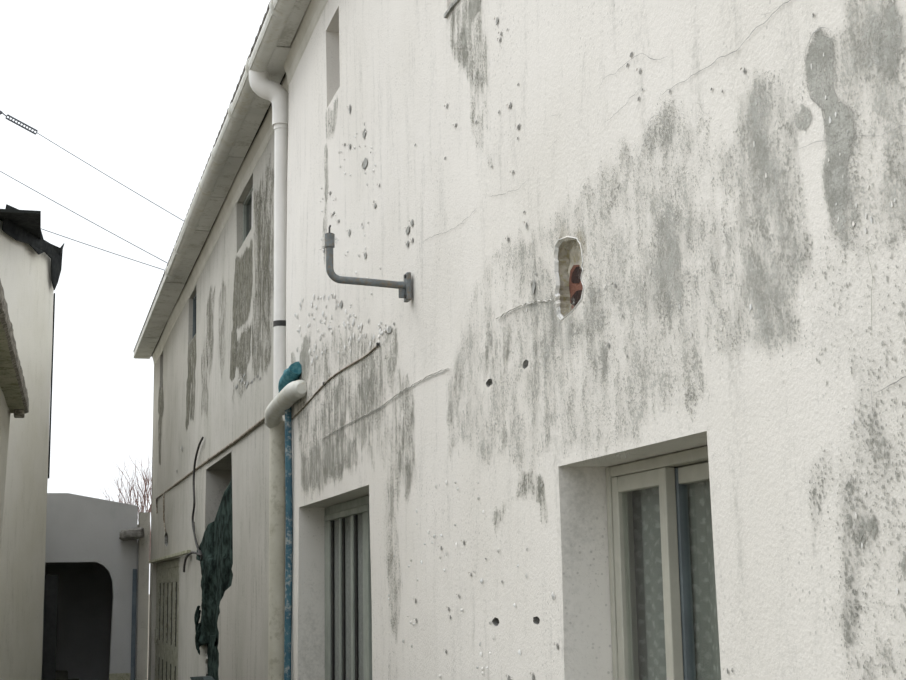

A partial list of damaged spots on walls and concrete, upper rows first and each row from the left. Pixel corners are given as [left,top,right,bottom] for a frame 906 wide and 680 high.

leakage [450,0,488,135]
crack [644,0,790,132]
leakage [185,160,274,429]
peeling [447,0,906,680]
leakage [291,328,415,634]